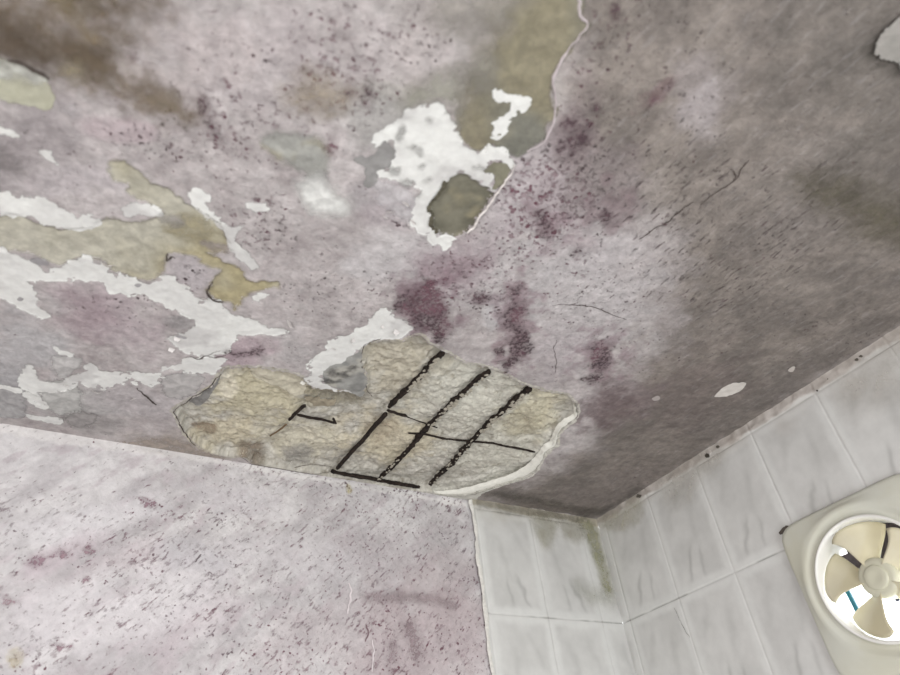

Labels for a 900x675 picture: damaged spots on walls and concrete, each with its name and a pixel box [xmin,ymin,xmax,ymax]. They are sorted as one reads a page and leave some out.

peeling [0,57,55,111]
peeling [353,0,590,251]
crack [640,160,749,239]
spalling [0,161,582,500]
peeling [714,382,746,397]
damp [580,522,611,592]